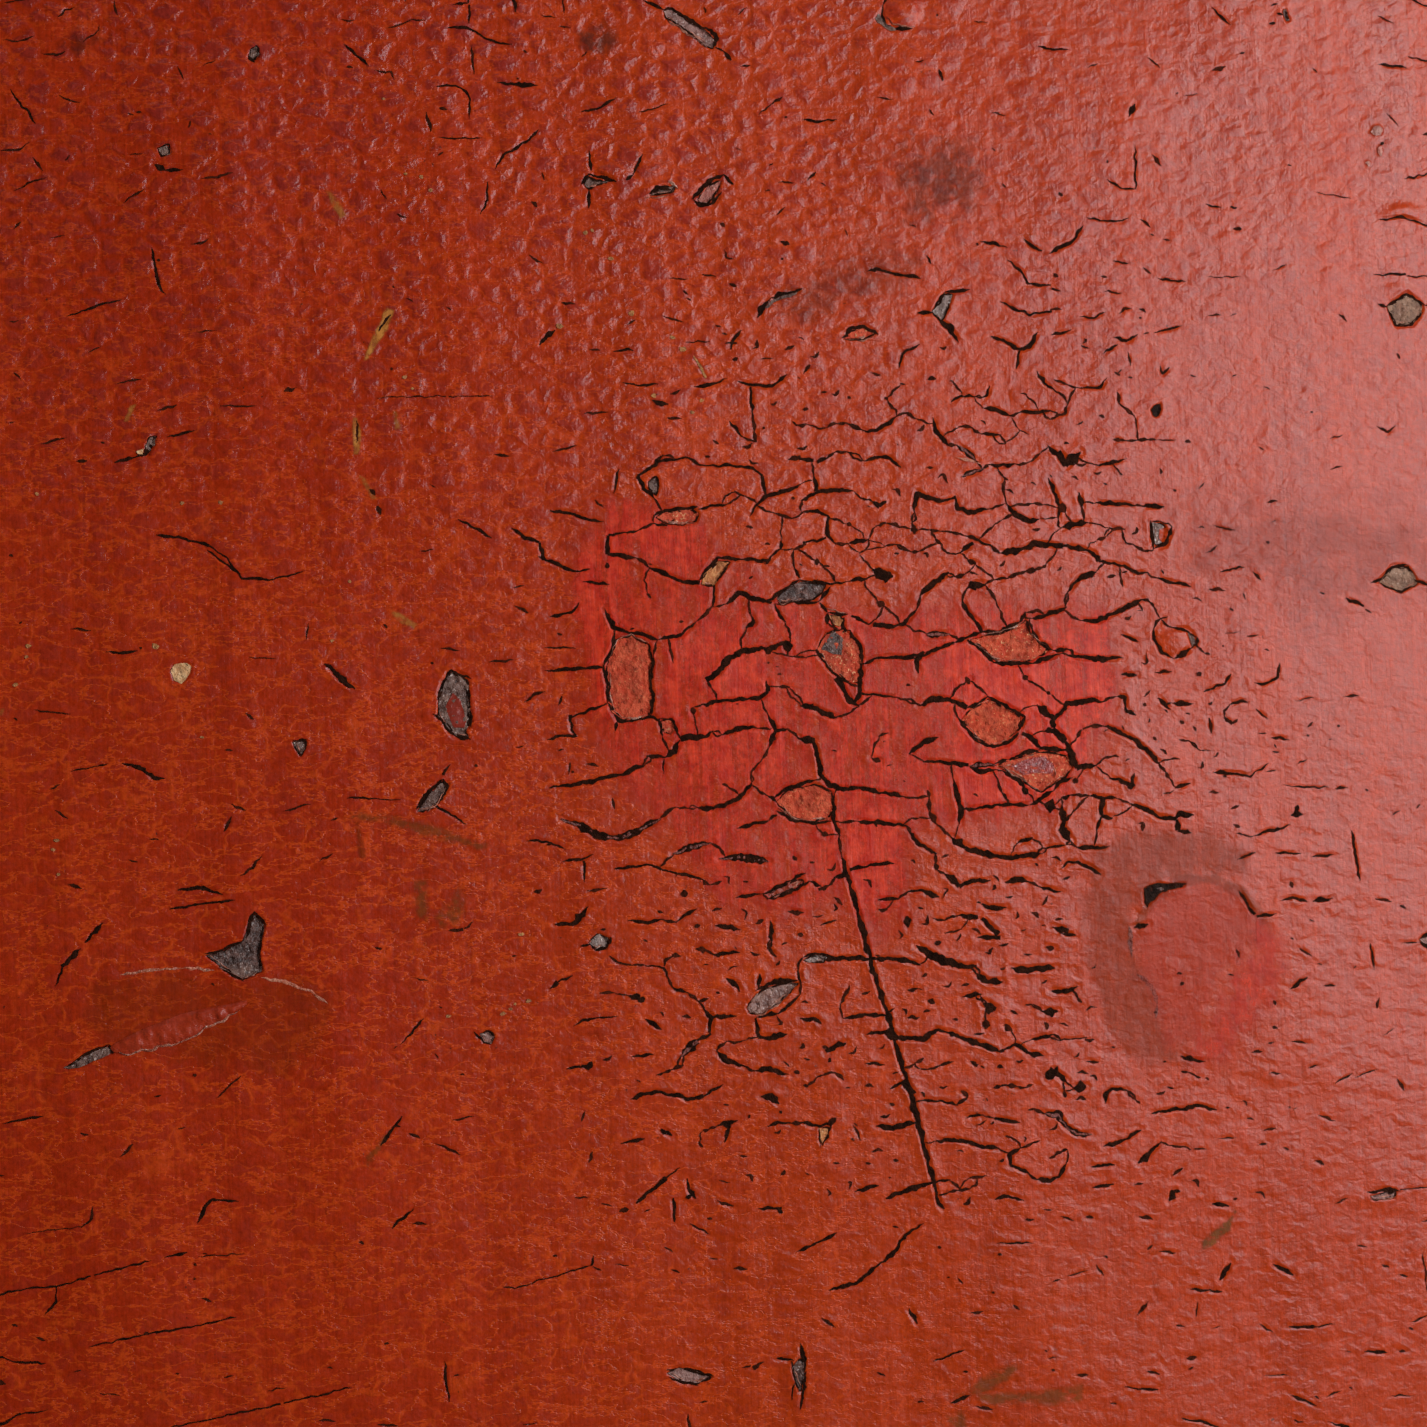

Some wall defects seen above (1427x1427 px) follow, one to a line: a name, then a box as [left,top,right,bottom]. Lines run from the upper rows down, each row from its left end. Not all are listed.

crack [1148,7,1245,96]
crack [0,90,77,231]
spalling [1378,293,1427,327]
crack [157,534,303,581]
spalling [1371,564,1427,594]
spalling [434,669,473,740]
spalling [545,609,696,771]
crack [431,104,1406,1328]
spalling [206,911,267,981]
spalling [747,952,831,1018]
crack [1110,1263,1231,1404]
crack [172,1367,352,1427]